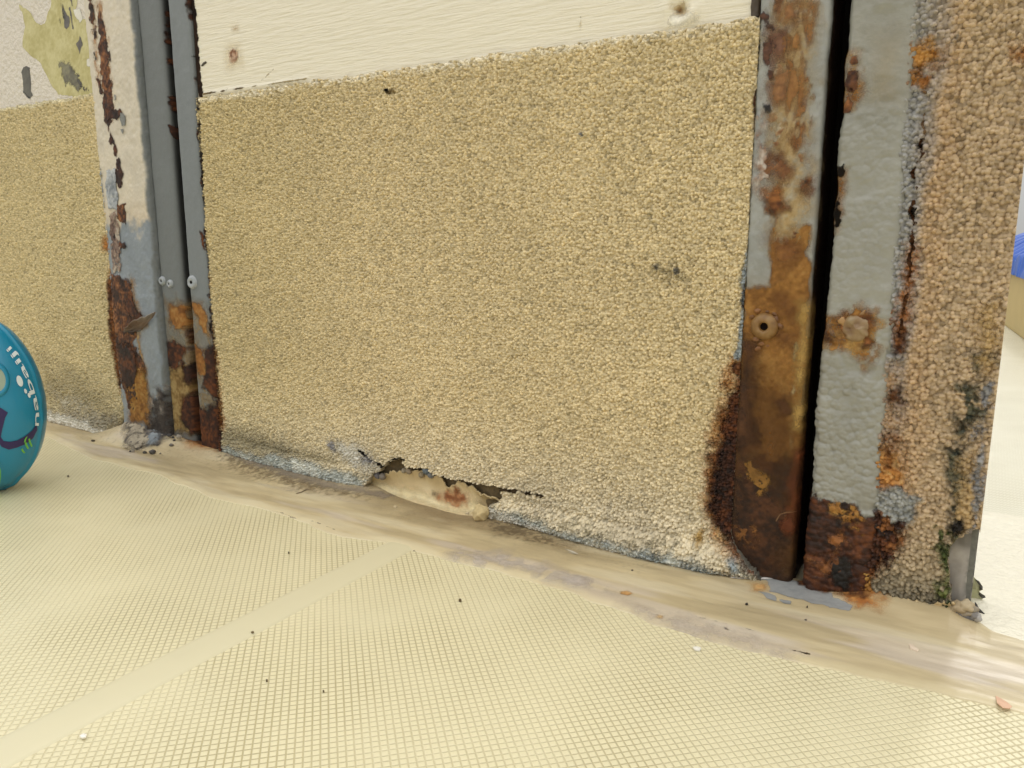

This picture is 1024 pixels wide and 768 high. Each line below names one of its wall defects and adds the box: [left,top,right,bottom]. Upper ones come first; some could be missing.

peeling [19,0,93,98]
corrosion [88,0,125,188]
corrosion [168,96,177,112]
corrosion [168,124,179,139]
corrosion [908,36,939,89]
corrosion [103,203,149,424]
corrosion [167,228,224,451]
corrosion [693,0,905,607]
spalling [369,459,502,521]